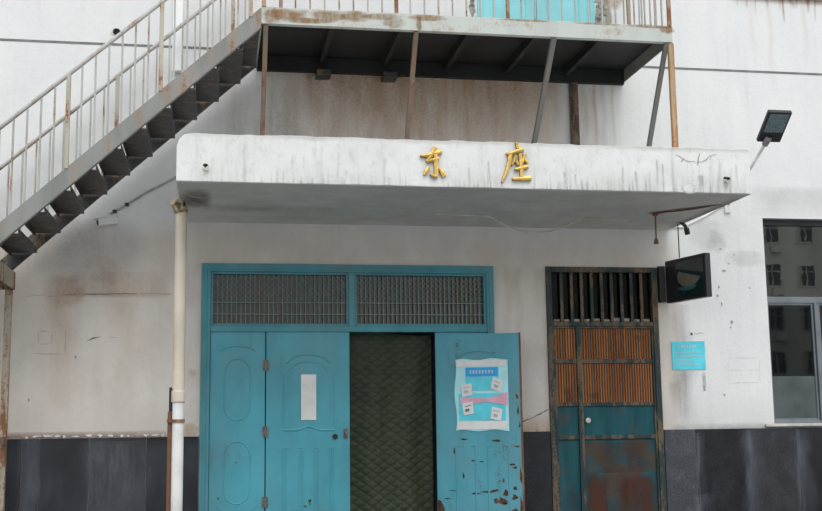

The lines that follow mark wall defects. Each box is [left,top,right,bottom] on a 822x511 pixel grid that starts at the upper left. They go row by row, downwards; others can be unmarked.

rust [267,10,371,23]
spalling [472,463,523,511]